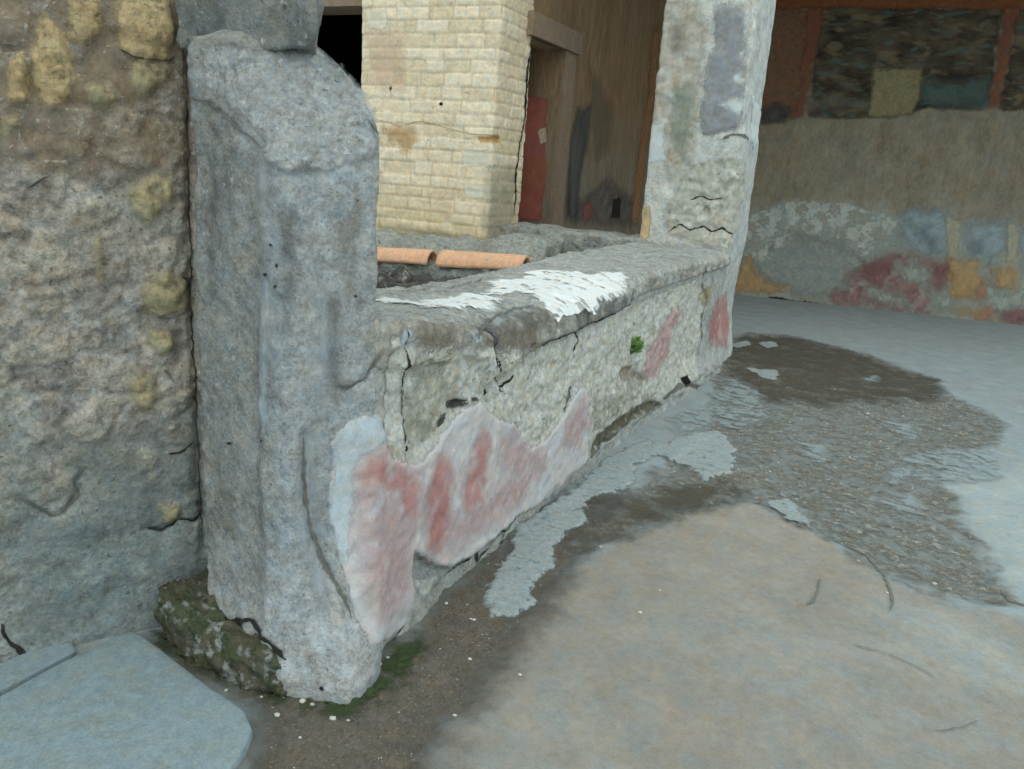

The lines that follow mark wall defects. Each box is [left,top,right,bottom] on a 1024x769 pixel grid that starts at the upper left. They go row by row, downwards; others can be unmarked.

crack [381,37,532,215]
crack [668,224,733,235]
crack [120,49,262,544]
crack [477,304,534,396]
flaking render [328,0,1024,646]
leakage [725,336,941,404]
leakage [798,442,828,462]
leakage [884,421,917,440]
leakage [578,480,739,551]
leakage [881,494,926,513]
crack [1,624,26,655]
crack [224,617,286,660]